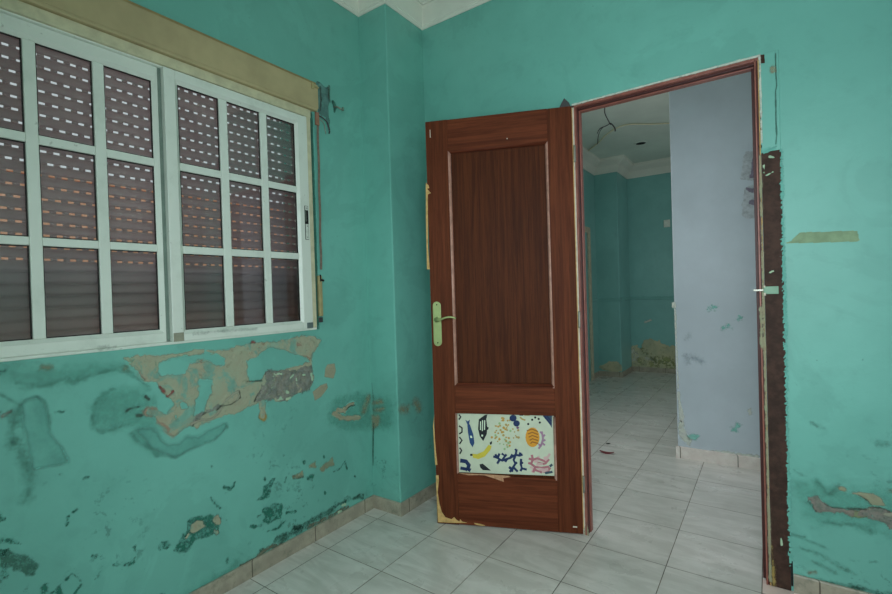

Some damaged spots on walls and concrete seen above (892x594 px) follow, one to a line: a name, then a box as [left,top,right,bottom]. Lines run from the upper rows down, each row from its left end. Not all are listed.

peeling [122,334,337,439]
spalling [331,400,361,421]
peeling [599,302,698,445]
peeling [292,455,356,480]
peeling [160,500,221,552]
spalling [240,478,364,566]
peeling [808,487,892,529]
peeling [0,539,38,576]